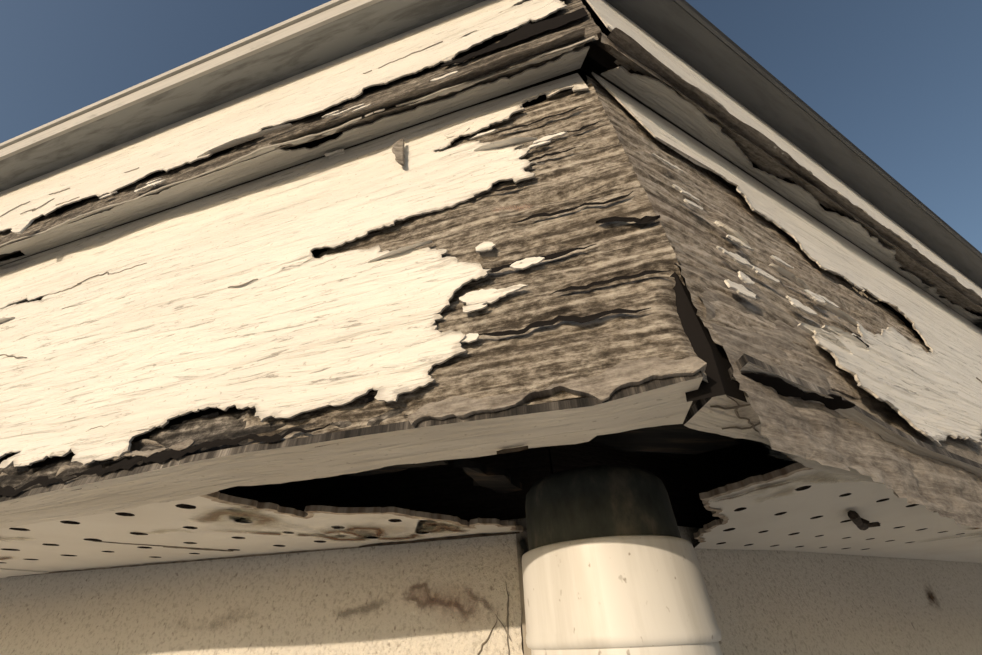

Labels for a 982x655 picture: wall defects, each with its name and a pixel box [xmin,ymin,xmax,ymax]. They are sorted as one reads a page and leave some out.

peeling [0,0,982,315]
crack [467,103,602,200]
crack [483,191,660,273]
peeling [243,75,930,445]
crack [478,270,856,434]
crack [496,446,528,454]
water stain [199,507,281,535]
crack [11,531,520,577]
water stain [298,528,418,541]
spalling [693,462,813,543]
crack [477,581,524,655]